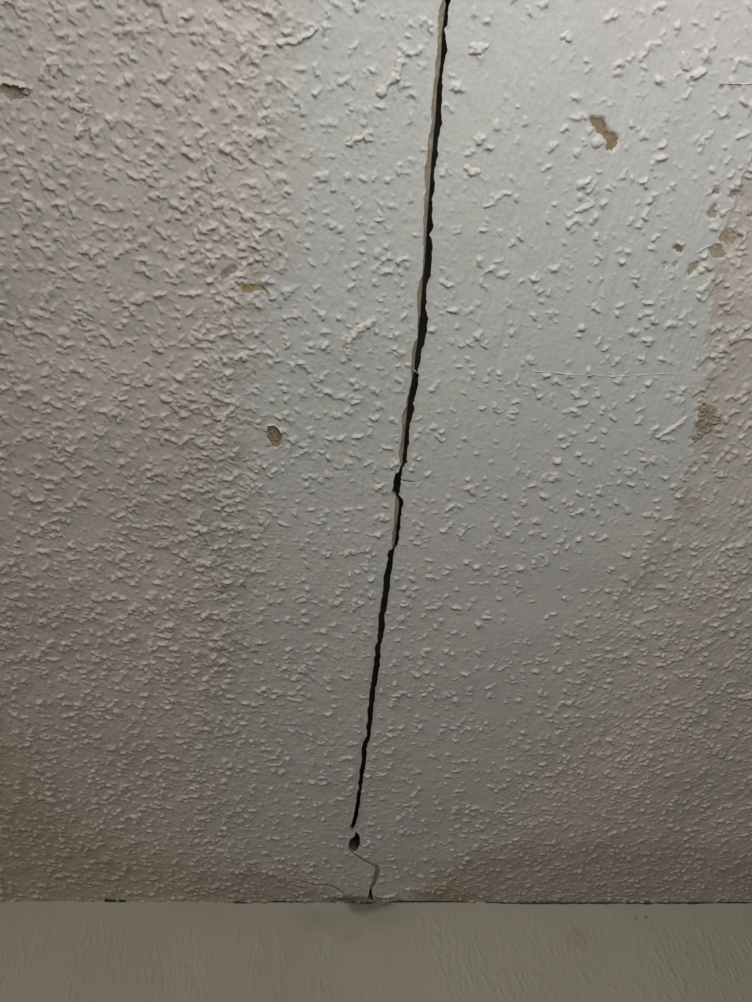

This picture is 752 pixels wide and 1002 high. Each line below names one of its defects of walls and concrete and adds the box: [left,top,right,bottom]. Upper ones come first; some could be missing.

crack [334,0,752,905]